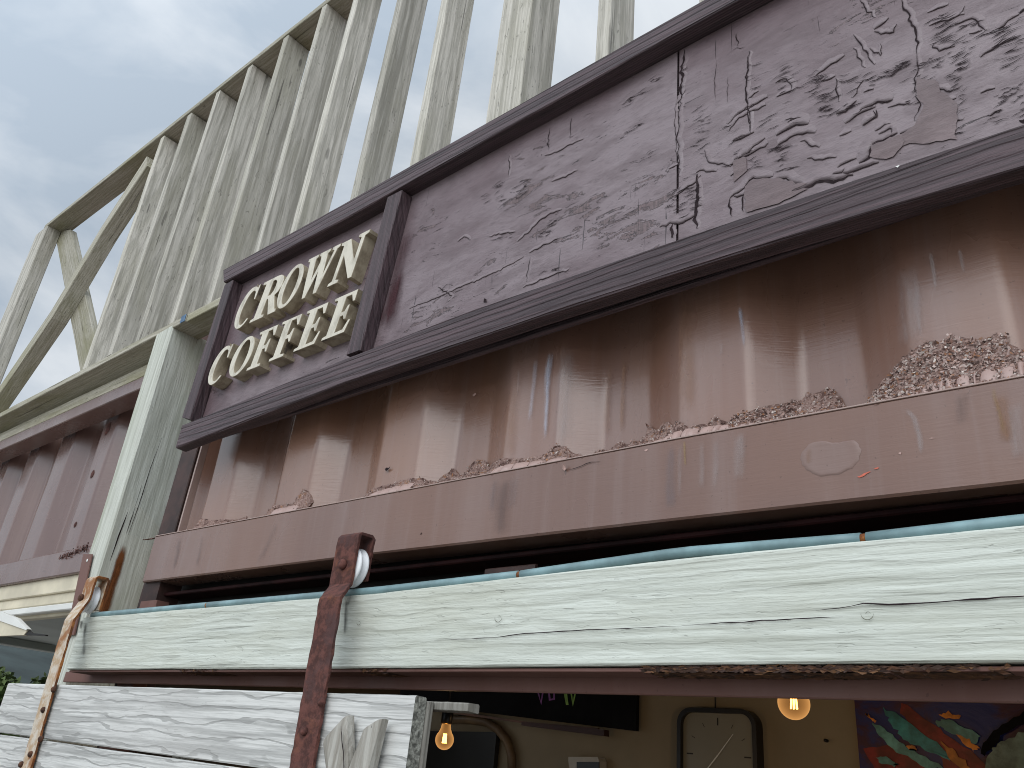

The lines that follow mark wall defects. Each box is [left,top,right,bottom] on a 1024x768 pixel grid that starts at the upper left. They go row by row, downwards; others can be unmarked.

crack [620,0,1024,238]
crack [545,122,583,182]
crack [409,154,569,309]
crack [451,619,670,640]
crack [695,596,1024,625]